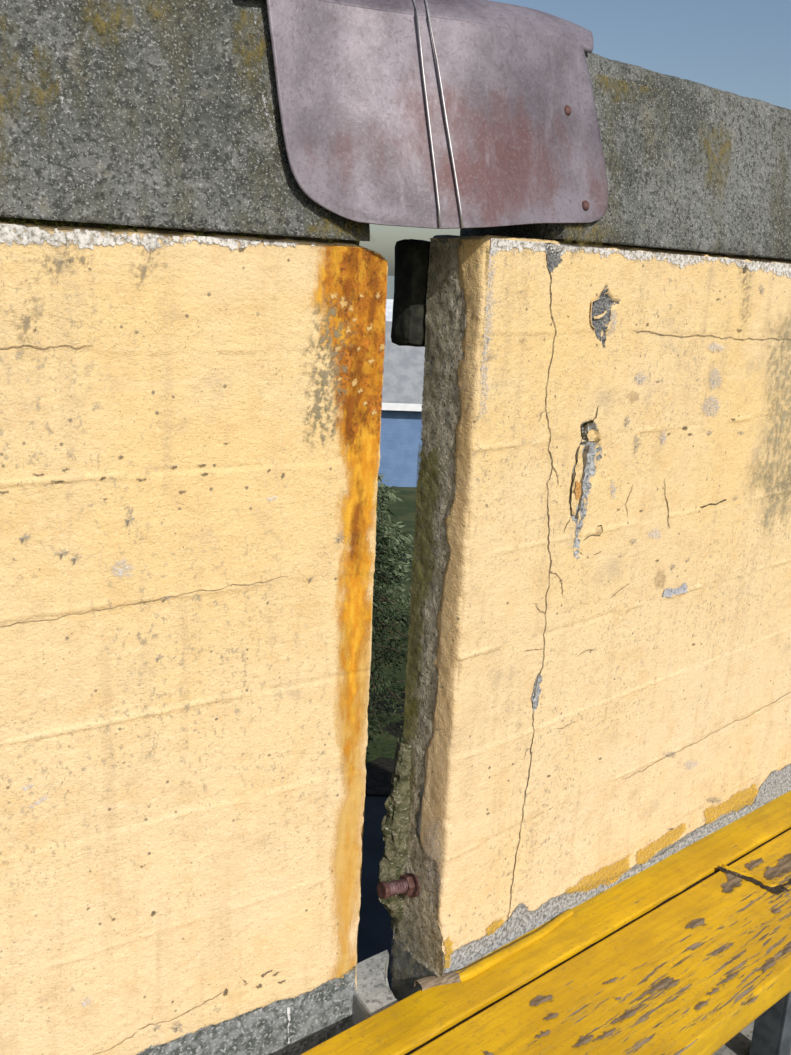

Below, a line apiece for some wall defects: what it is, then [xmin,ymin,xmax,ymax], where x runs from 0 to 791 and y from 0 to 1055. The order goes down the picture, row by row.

crack [93,992,223,1055]
corrosion [311,218,387,985]
crack [506,243,574,937]
peeling [377,238,791,978]
crack [622,692,790,780]
damp [754,321,791,526]